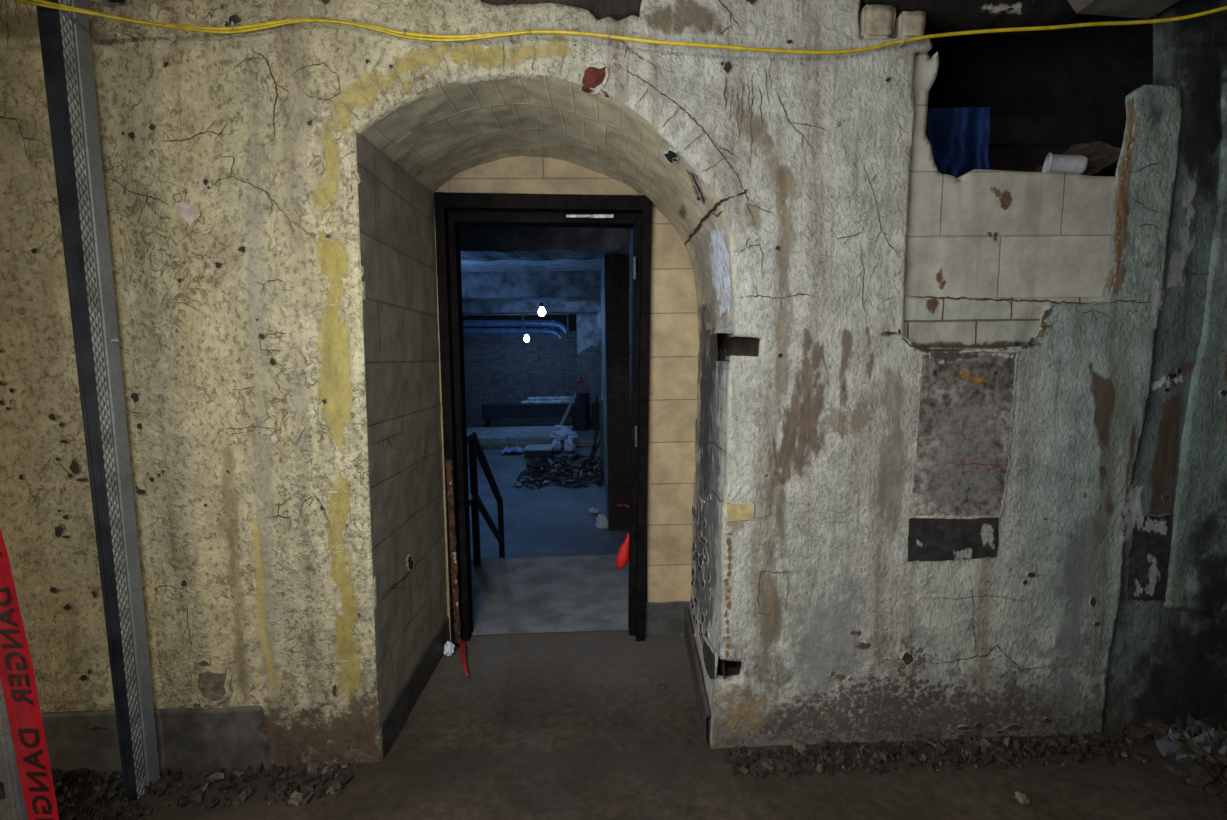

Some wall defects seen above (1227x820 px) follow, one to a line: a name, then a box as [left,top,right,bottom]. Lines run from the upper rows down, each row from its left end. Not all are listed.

crack [228,34,341,139]
crack [613,41,816,310]
spalling [859,5,1153,176]
corrosion [1106,100,1138,288]
water stain [317,232,351,447]
water stain [769,214,852,537]
peeling [907,348,1018,519]
water stain [262,477,380,766]
peeling [690,494,754,658]
water stain [758,577,780,691]